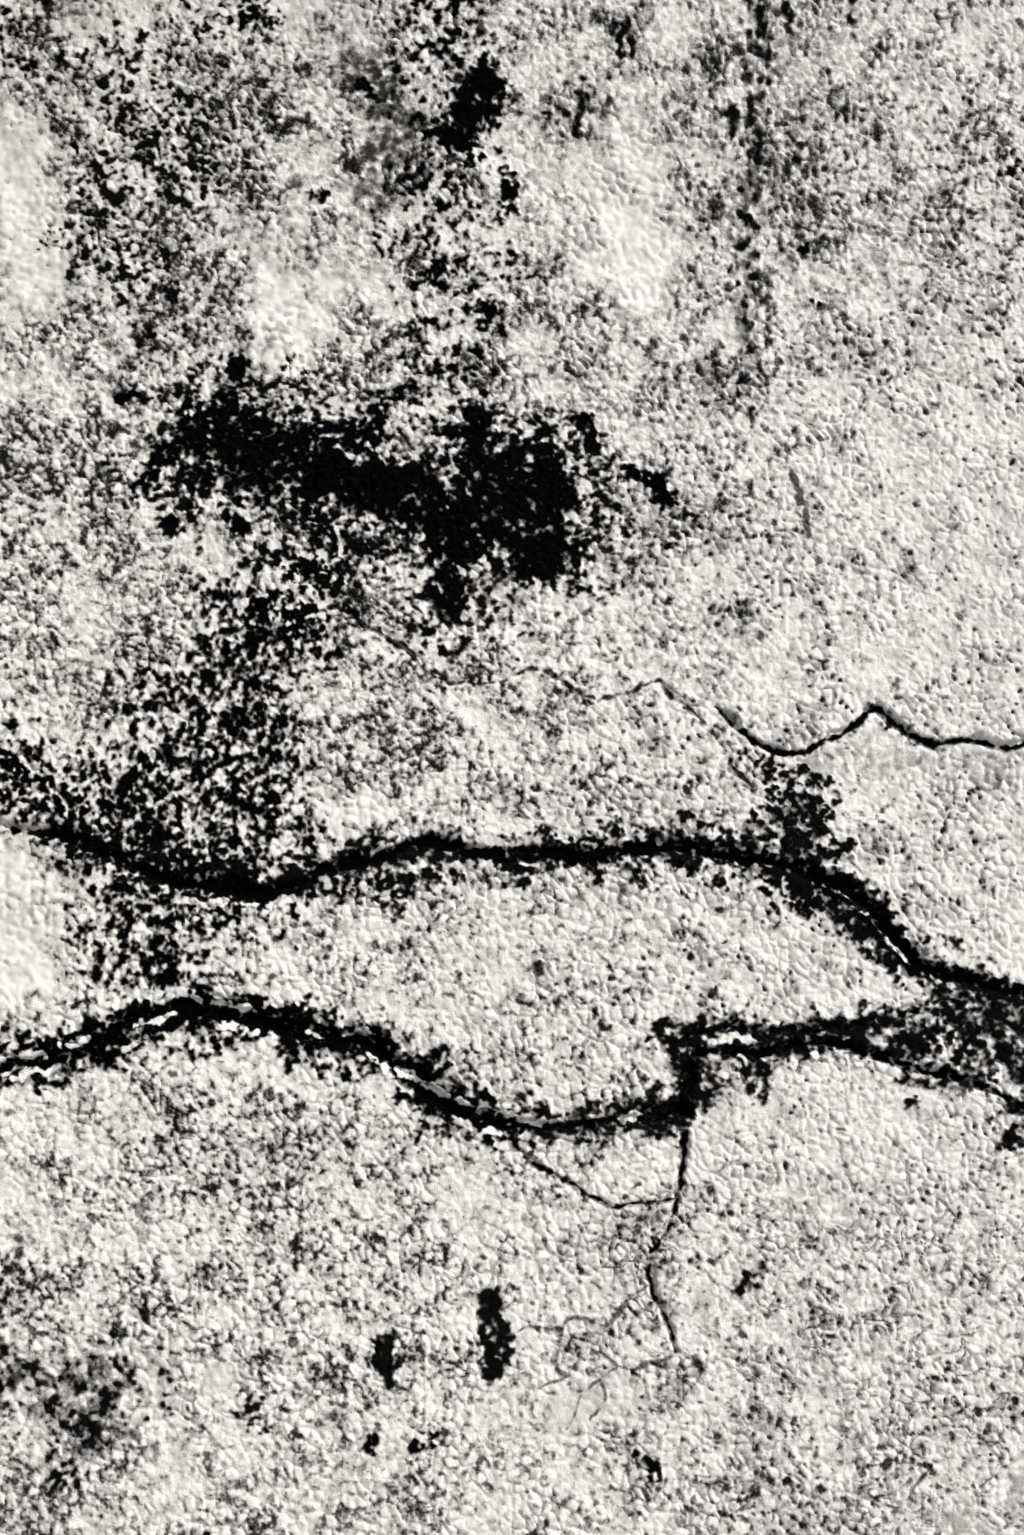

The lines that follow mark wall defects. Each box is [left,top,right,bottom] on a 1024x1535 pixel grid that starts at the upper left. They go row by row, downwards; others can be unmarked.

water stain [0,0,700,1022]
crack [0,603,1024,1428]